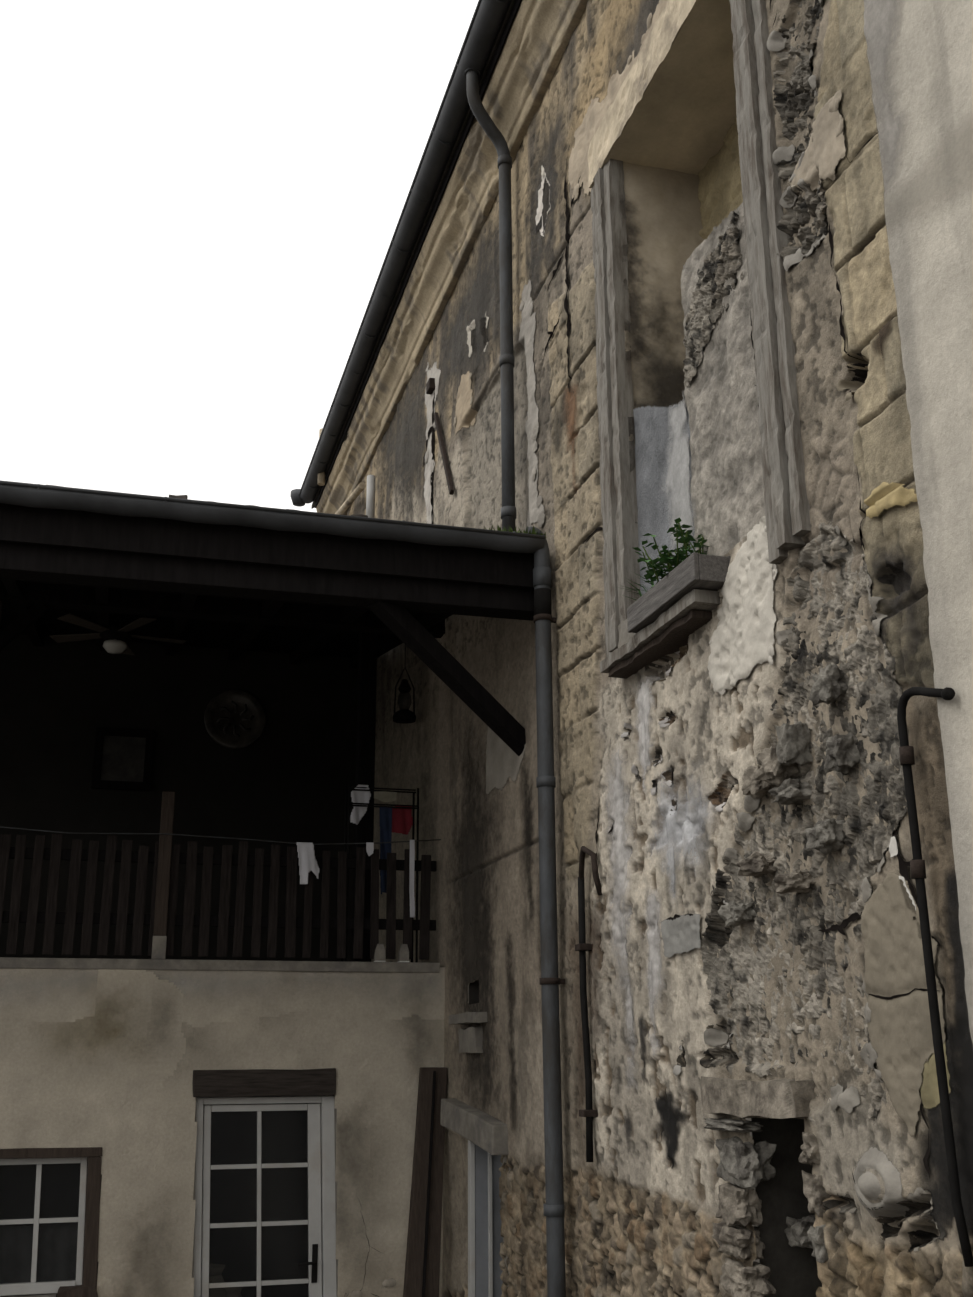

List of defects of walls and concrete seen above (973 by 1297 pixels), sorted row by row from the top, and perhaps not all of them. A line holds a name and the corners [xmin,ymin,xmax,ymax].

flaking render [424,361,441,524]
flaking render [453,313,489,435]
flaking render [535,166,551,237]
crack [541,160,581,392]
flaking render [568,0,668,200]
spalling [666,209,743,545]
spalling [767,0,847,271]
flaking render [864,482,918,519]
spalling [673,516,907,1122]
water stain [655,1092,686,1168]
spalling [751,1116,858,1297]
water stain [920,872,973,1241]